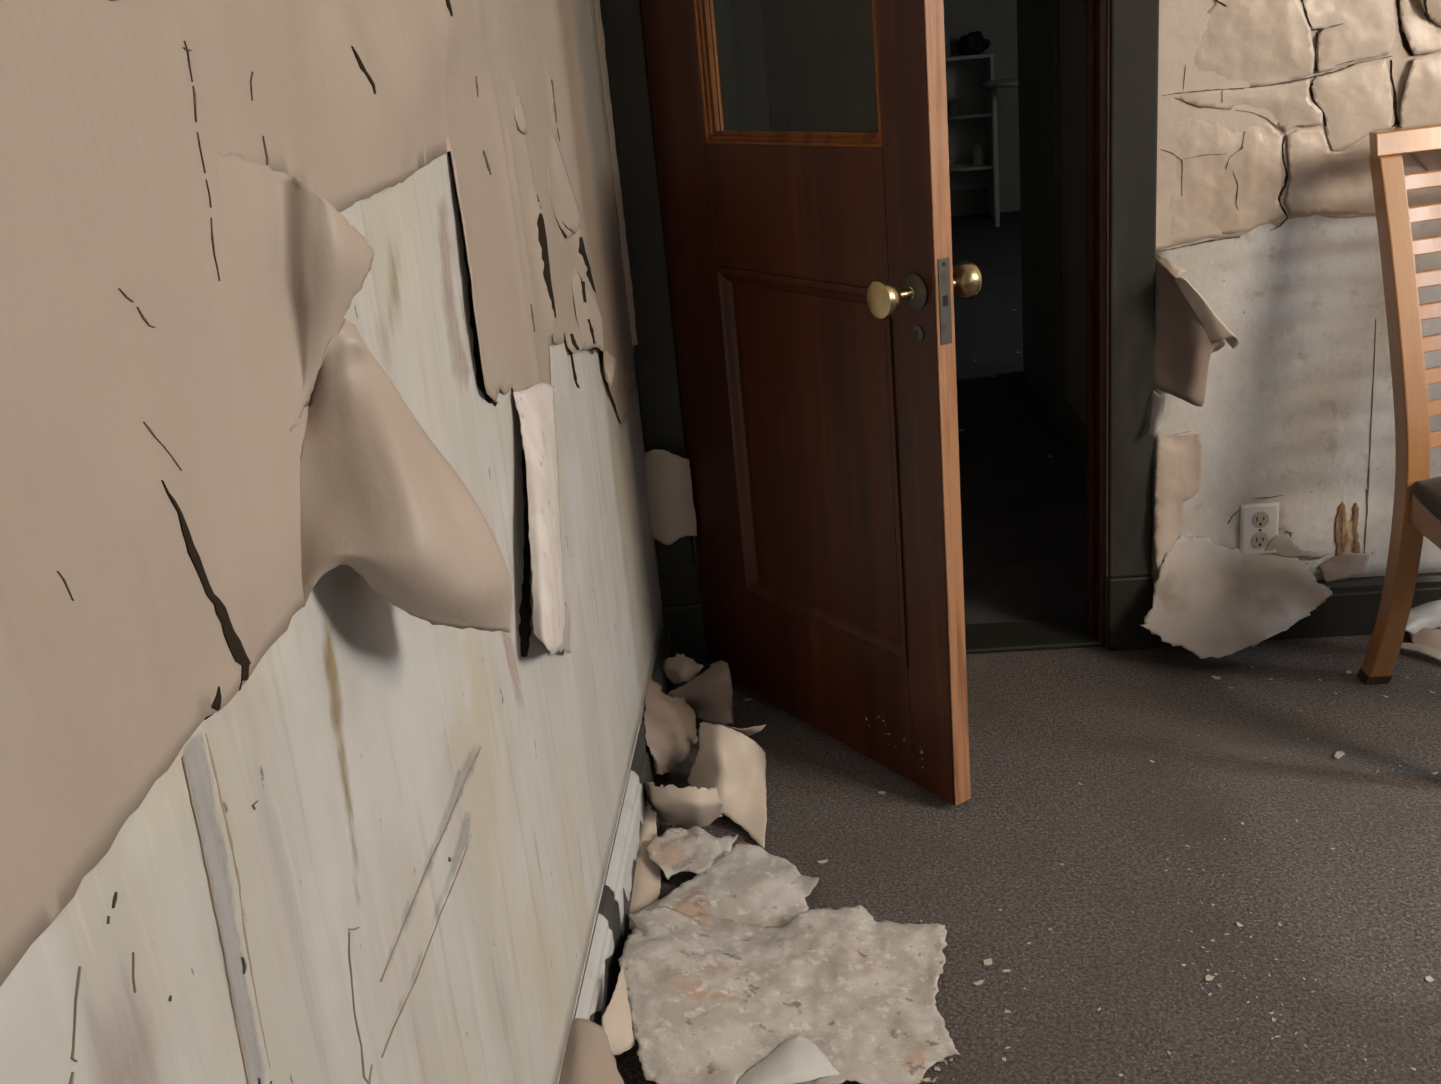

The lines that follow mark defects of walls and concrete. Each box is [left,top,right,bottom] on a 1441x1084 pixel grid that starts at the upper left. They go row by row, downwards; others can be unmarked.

crack [182,41,220,281]
crack [248,72,256,101]
crack [261,136,269,166]
crack [351,46,376,94]
crack [445,0,453,17]
crack [1159,0,1430,252]
peeling [1151,215,1395,590]
peeling [1411,219,1441,478]
crack [143,421,251,720]
peeling [0,152,663,1084]
peeling [1418,536,1441,574]